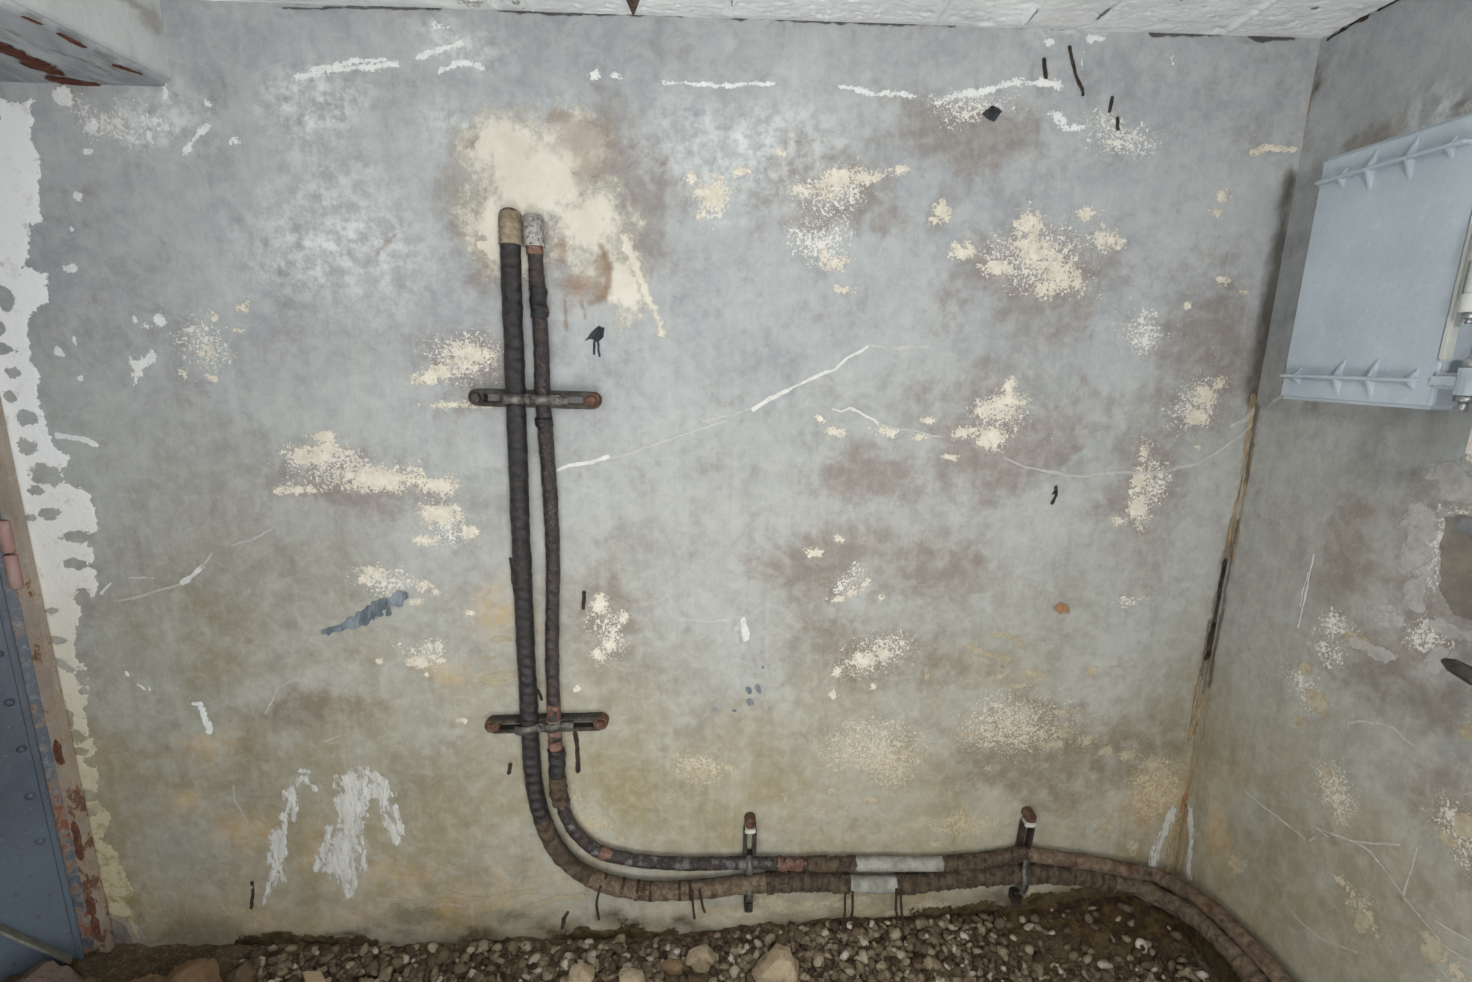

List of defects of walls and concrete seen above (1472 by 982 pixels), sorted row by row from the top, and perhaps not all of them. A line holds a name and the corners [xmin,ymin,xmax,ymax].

rust [0,43,101,86]
rust [21,16,88,48]
peeling [293,20,486,83]
crack [1028,8,1120,131]
peeling [0,85,141,944]